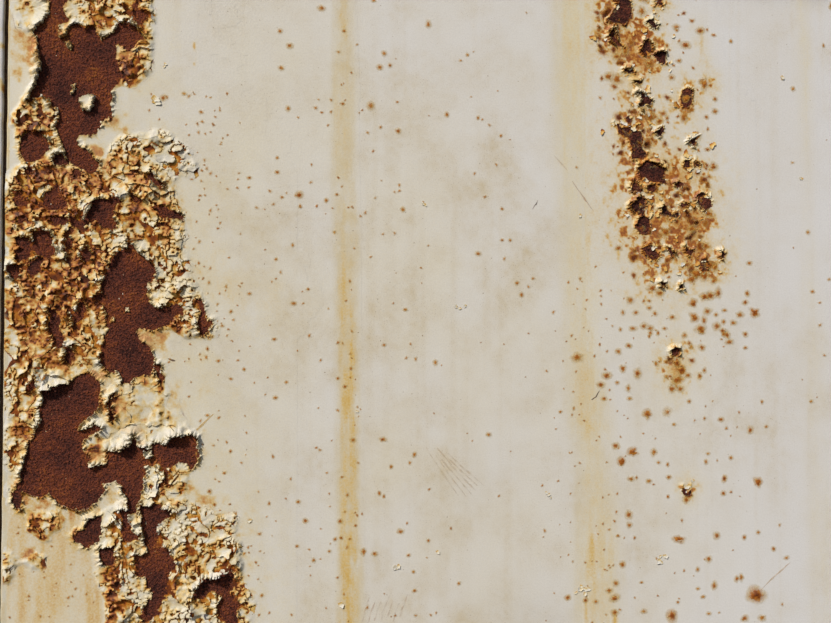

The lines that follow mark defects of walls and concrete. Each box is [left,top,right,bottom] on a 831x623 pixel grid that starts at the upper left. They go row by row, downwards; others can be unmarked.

peeling [9,0,50,42]
peeling [8,90,64,149]
peeling [63,0,167,91]
spalling [589,0,730,297]
corrosion [573,0,758,439]
peeling [3,126,222,480]
corrosion [3,0,309,623]
corrosion [314,0,377,623]
peeling [92,462,259,623]
corrosion [582,532,624,623]
corrosion [647,450,732,521]
corrosion [749,589,764,601]